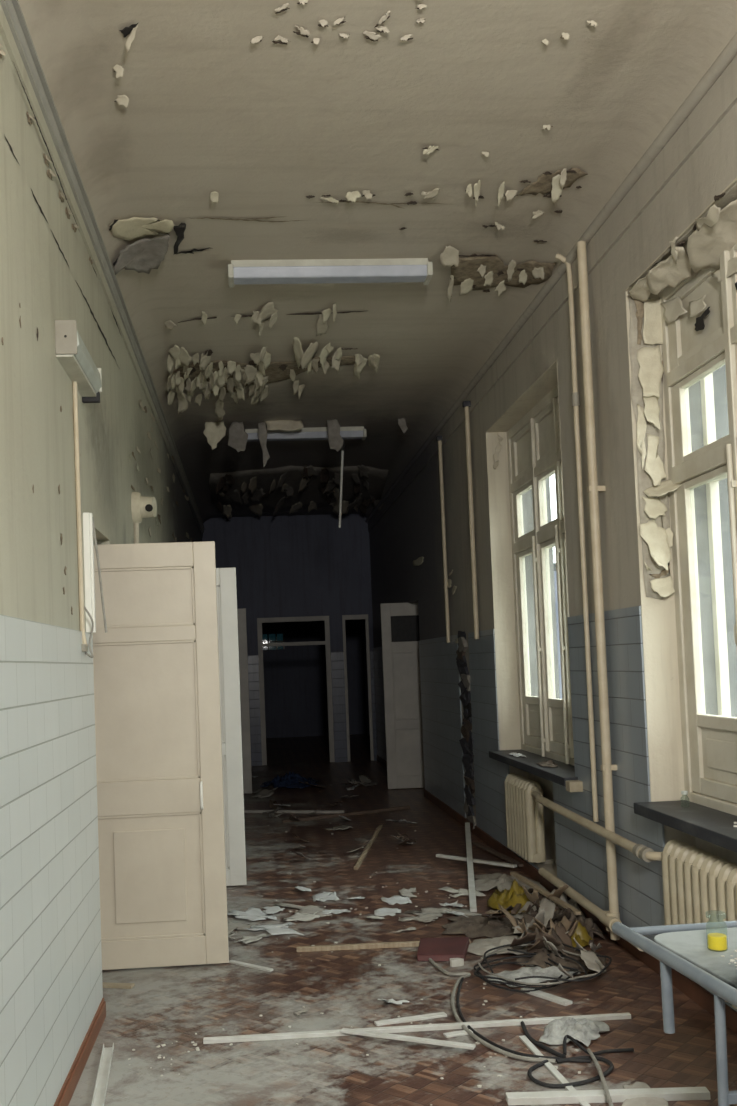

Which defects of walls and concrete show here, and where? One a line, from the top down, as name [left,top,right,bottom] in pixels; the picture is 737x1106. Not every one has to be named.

peeling [274,0,309,14]
peeling [250,17,350,45]
peeling [363,0,427,41]
crack [13,62,120,369]
peeling [306,190,375,204]
peeling [404,188,440,205]
peeling [465,180,484,205]
peeling [498,168,588,220]
flaking render [109,217,186,275]
peeling [440,246,556,302]
peeling [165,302,388,519]
peeling [628,183,737,600]